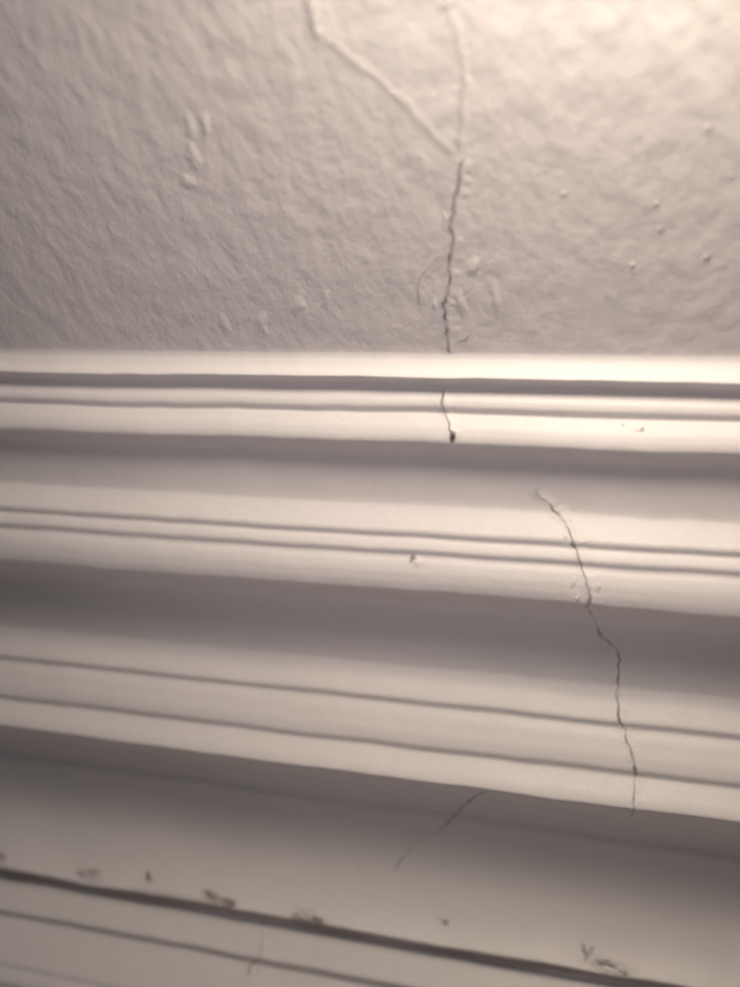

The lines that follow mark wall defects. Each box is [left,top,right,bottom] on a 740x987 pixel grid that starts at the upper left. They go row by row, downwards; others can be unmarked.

crack [300,0,478,354]
crack [434,388,463,442]
crack [533,487,648,818]
crack [391,790,492,875]